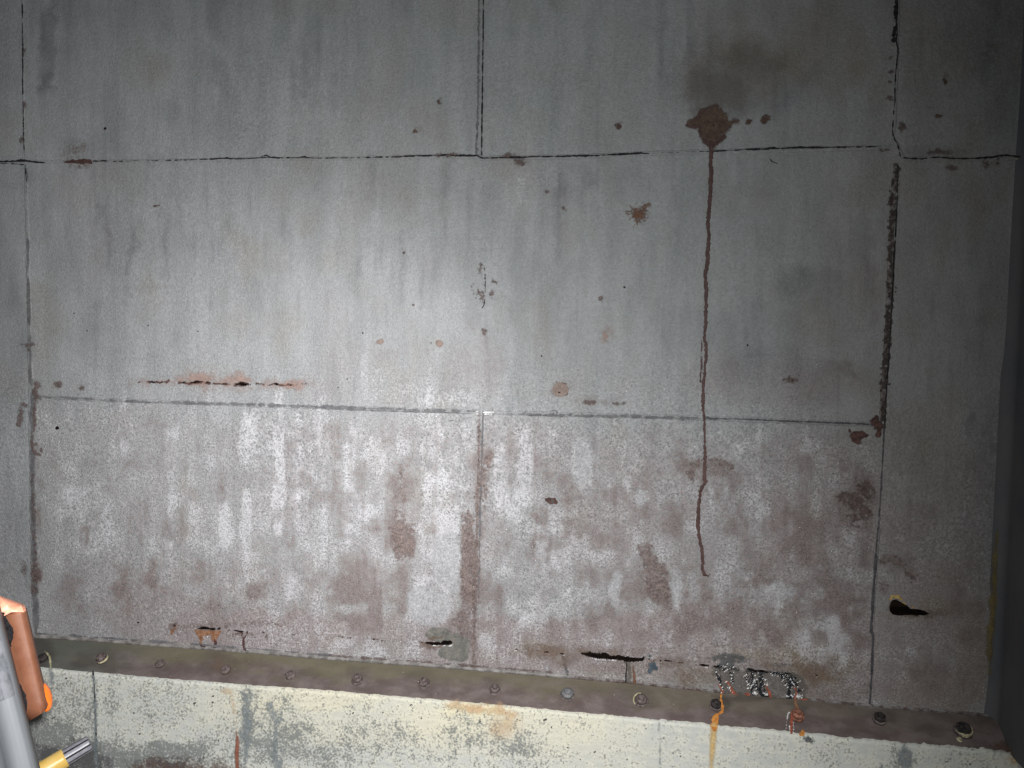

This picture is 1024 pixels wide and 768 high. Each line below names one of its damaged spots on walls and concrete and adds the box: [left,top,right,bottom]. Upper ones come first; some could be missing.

corrosion [626,203,651,228]
corrosion [879,167,901,430]
corrosion [685,105,771,577]
corrosion [138,379,293,387]
corrosion [848,429,869,445]
spalling [889,600,929,616]
damp [426,628,470,662]
damp [713,653,807,700]
corrosion [710,693,724,768]